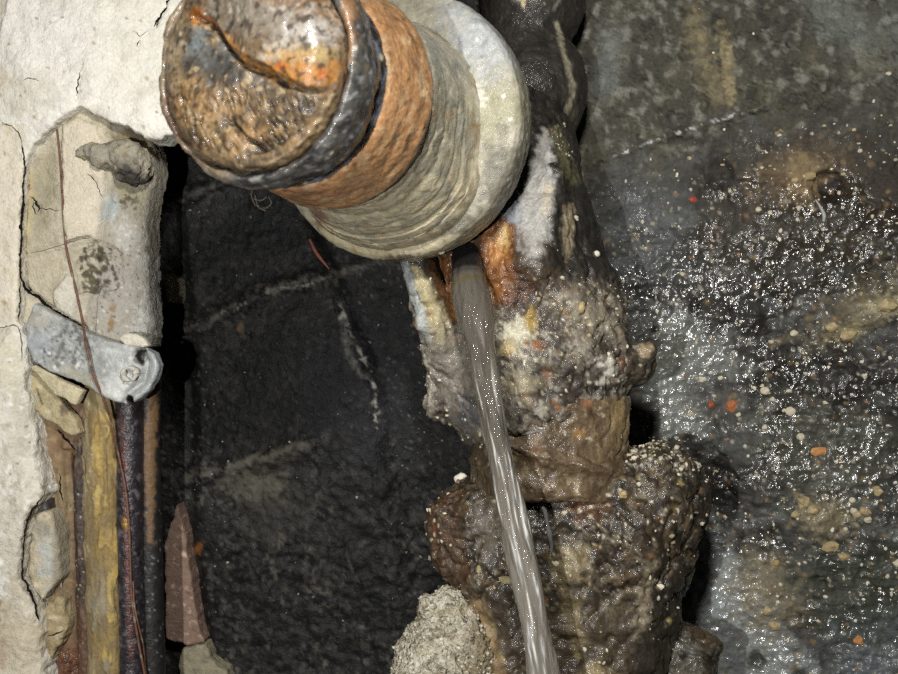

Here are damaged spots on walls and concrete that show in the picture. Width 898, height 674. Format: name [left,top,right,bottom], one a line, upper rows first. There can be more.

crack [136,0,169,46]
corrosion [429,253,456,325]
corrosion [479,217,539,311]
peeling [119,333,152,348]
peeling [31,365,87,436]
flaking render [29,507,71,599]
flaking render [164,502,210,645]
corrosion [56,649,79,674]